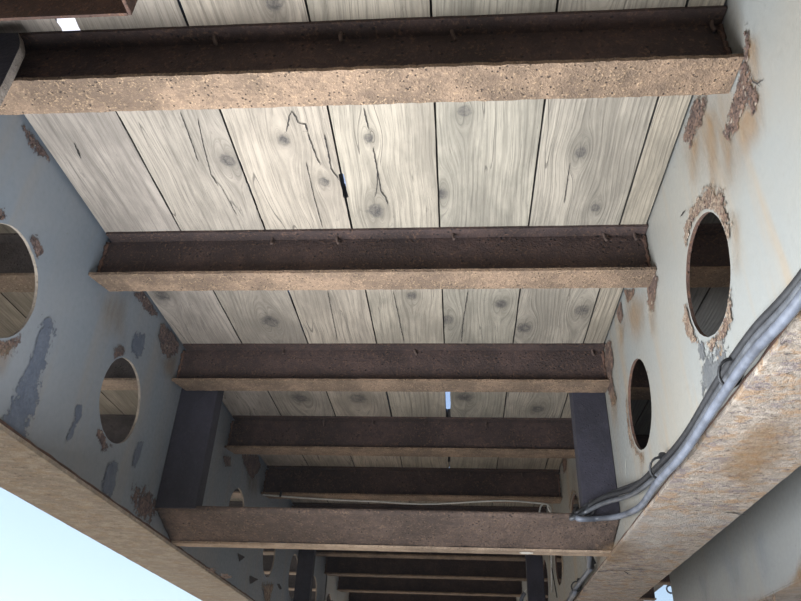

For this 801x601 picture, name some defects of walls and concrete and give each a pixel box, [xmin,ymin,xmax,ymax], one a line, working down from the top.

corrosion [723,23,758,142]
corrosion [22,125,50,162]
crack [286,111,338,225]
crack [373,148,388,205]
corrosion [683,95,707,150]
peeling [30,235,44,257]
peeling [683,182,732,249]
peeling [0,314,57,437]
peeling [682,289,732,396]